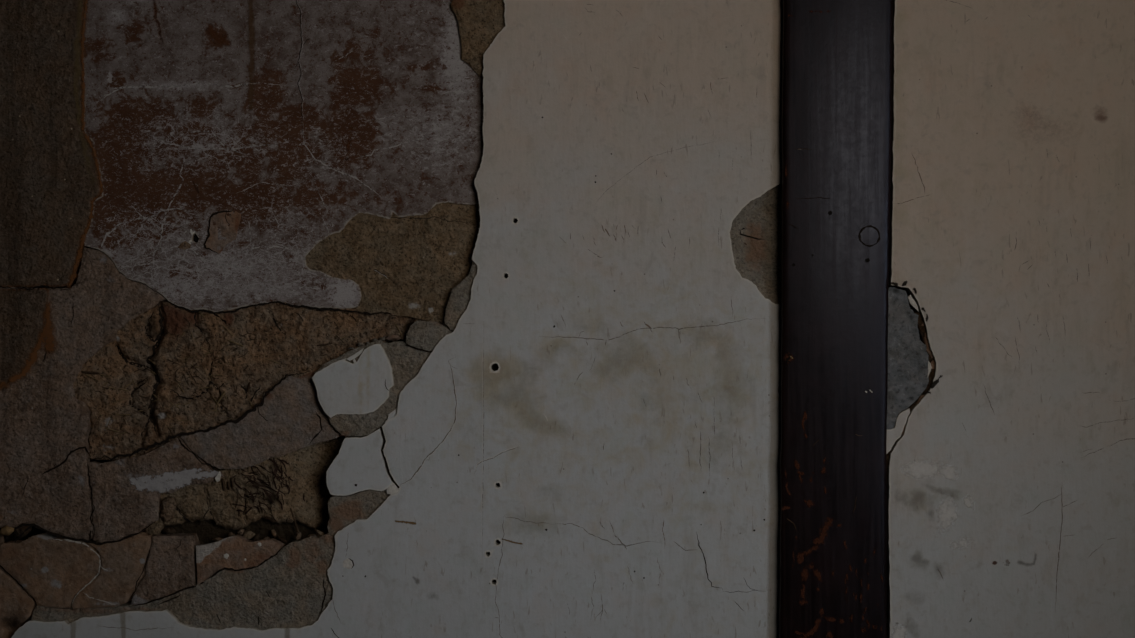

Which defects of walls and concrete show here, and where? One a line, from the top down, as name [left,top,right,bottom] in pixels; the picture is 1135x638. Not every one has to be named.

peeling [73,0,505,460]
spalling [730,184,781,305]
crack [0,0,468,638]
spalling [130,436,346,546]
crack [495,514,758,638]